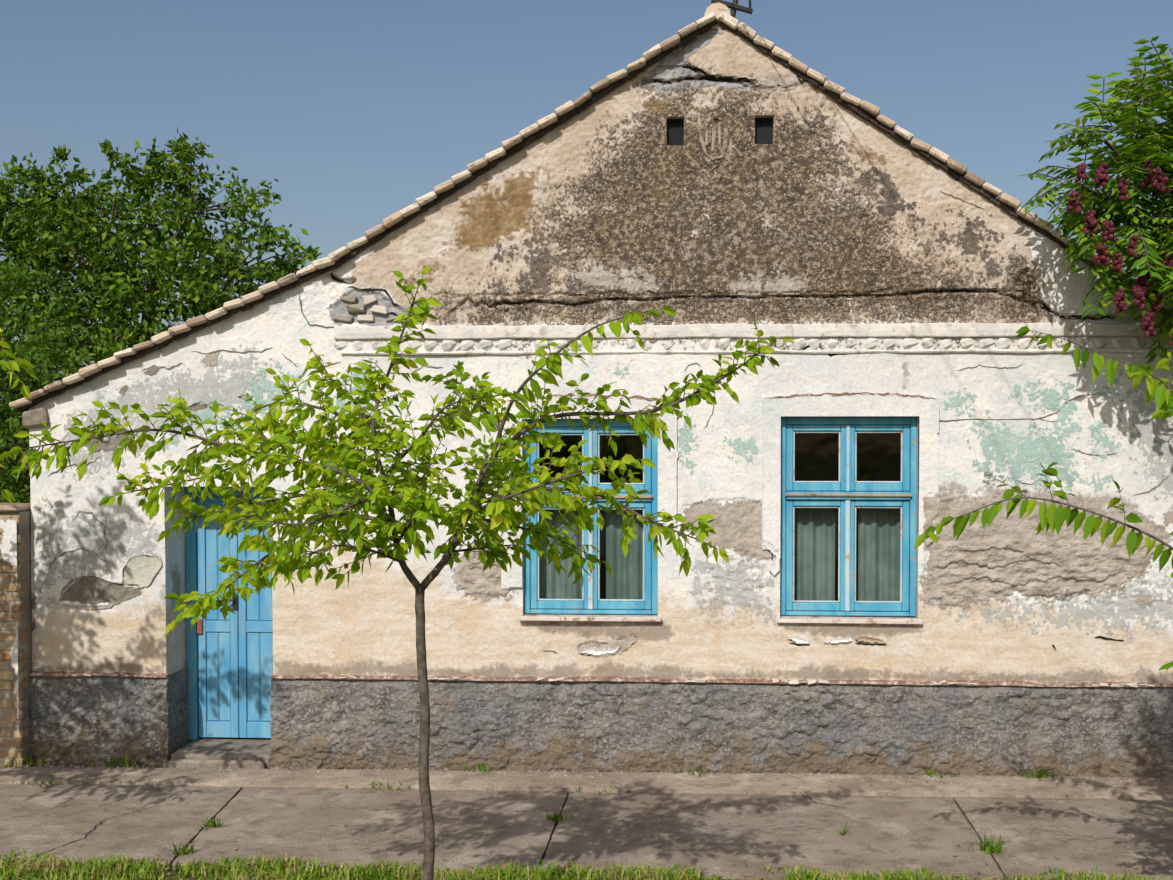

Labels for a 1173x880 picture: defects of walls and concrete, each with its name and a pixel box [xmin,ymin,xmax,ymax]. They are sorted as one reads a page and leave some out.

crack [643,66,805,87]
damp [853,153,904,221]
damp [966,214,1004,243]
crack [299,293,335,328]
crack [453,289,1116,320]
crack [192,347,339,387]
peeling [764,369,1173,526]
peeling [31,498,165,632]
peeling [681,498,780,628]
peeling [922,567,1173,642]
flaking render [577,634,637,658]
peeling [824,636,886,645]